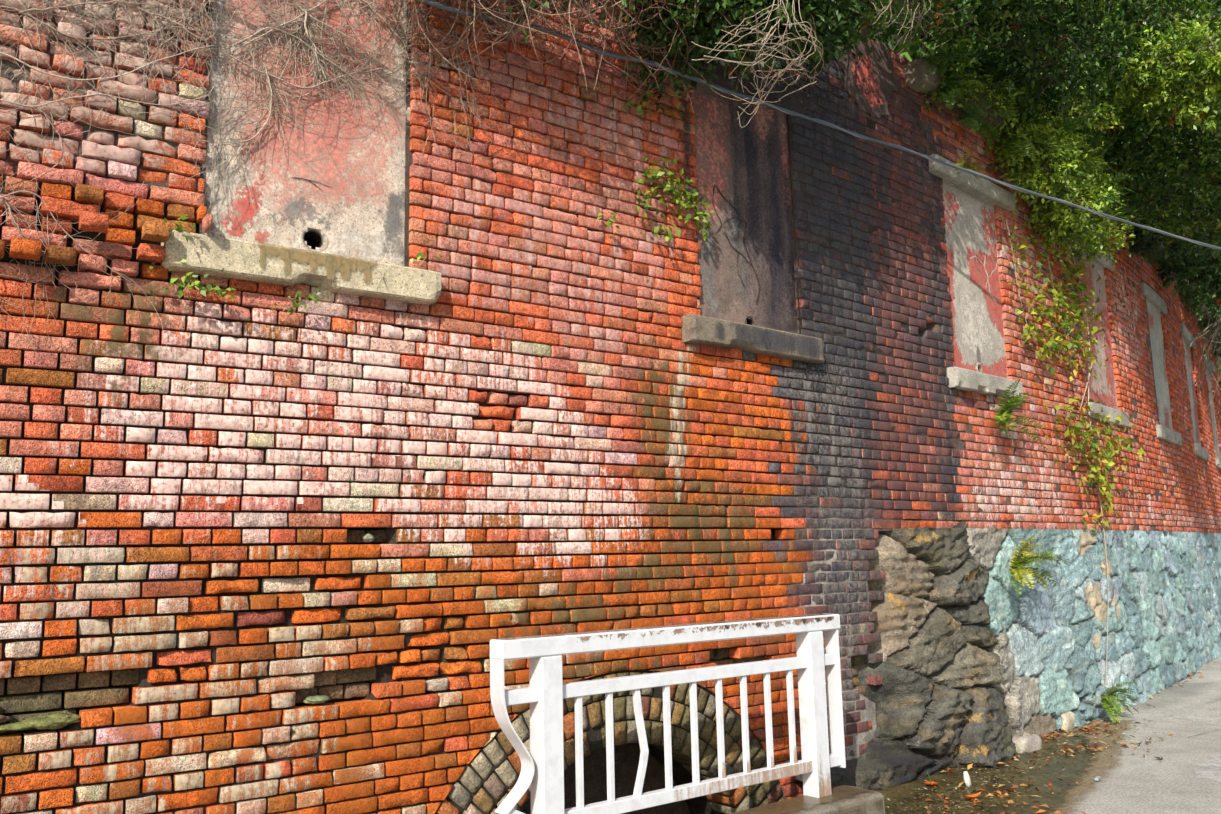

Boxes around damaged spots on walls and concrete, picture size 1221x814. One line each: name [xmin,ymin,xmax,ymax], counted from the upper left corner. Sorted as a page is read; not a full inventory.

peeling [205,0,407,255]
peeling [837,40,900,120]
water stain [250,232,403,284]
peeling [942,189,960,234]
peeling [946,207,1007,378]
water stain [82,290,654,577]
spalling [468,390,532,433]
water stain [651,346,694,503]
water stain [717,48,1135,814]
spalling [0,649,211,733]